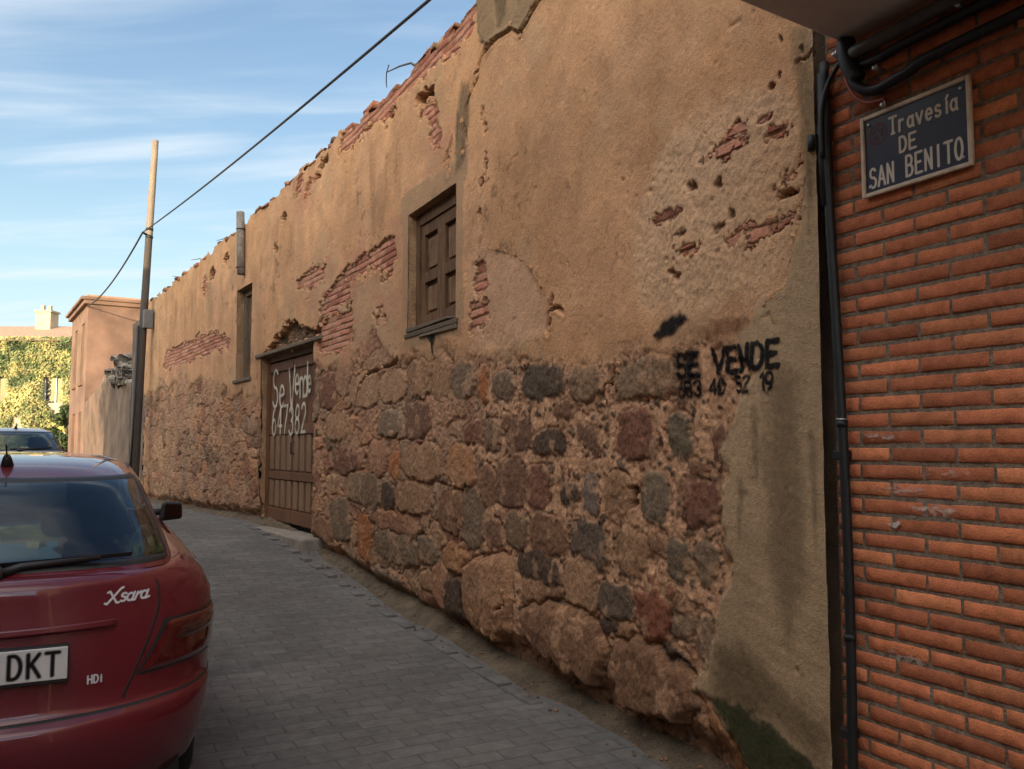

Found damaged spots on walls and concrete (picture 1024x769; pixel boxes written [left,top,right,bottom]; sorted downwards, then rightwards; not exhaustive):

flaking render [417,95,443,148]
flaking render [708,113,793,163]
flaking render [649,207,682,226]
flaking render [724,212,800,251]
flaking render [276,236,398,354]
flaking render [470,246,547,335]
flaking render [164,332,230,371]